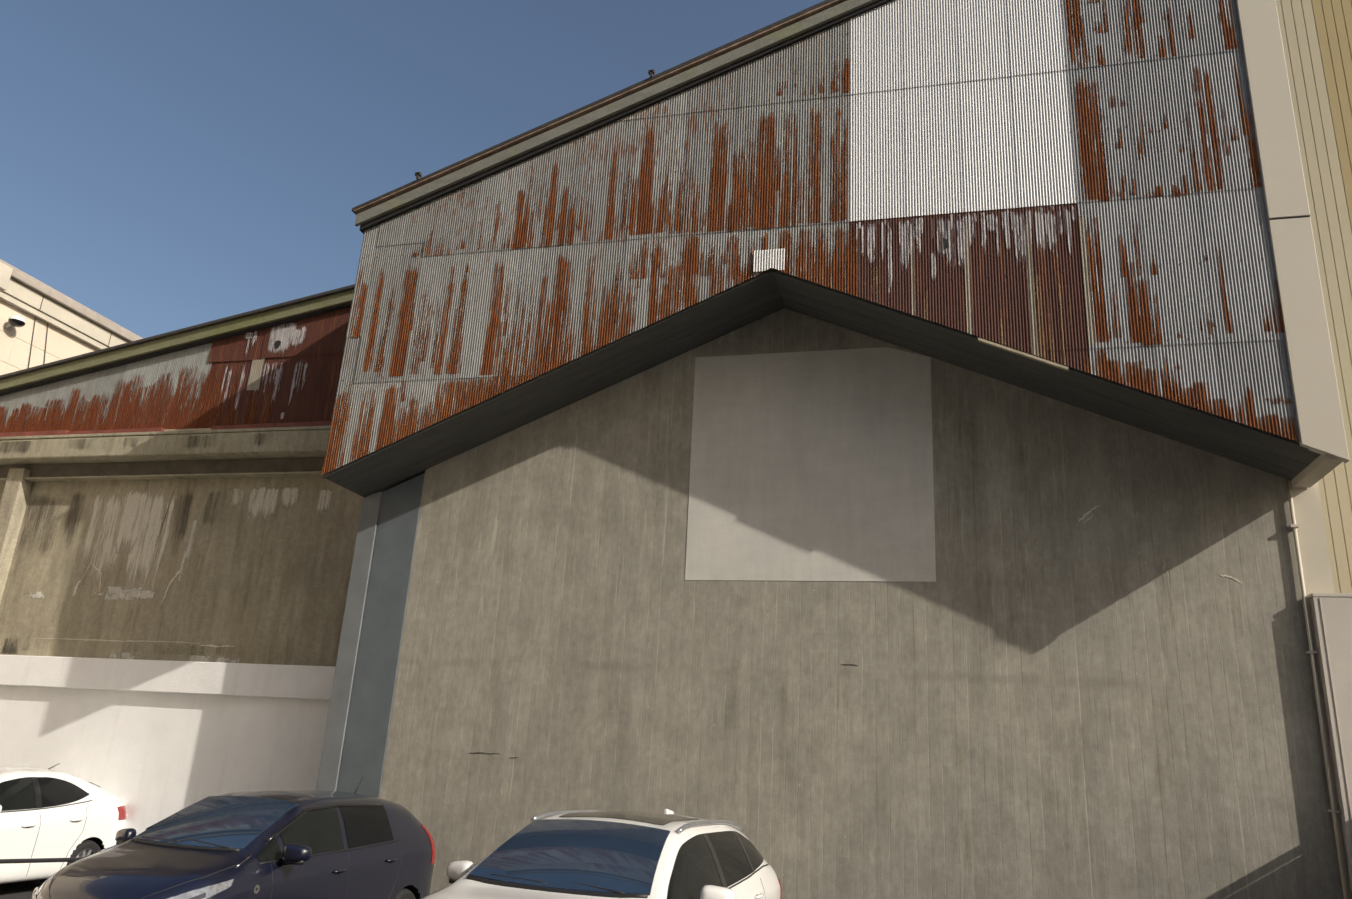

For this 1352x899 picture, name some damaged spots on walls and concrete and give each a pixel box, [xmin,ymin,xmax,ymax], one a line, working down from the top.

rust [0,59,880,476]
rust [1034,0,1298,442]
leakage [20,489,197,600]
leakage [211,486,299,519]